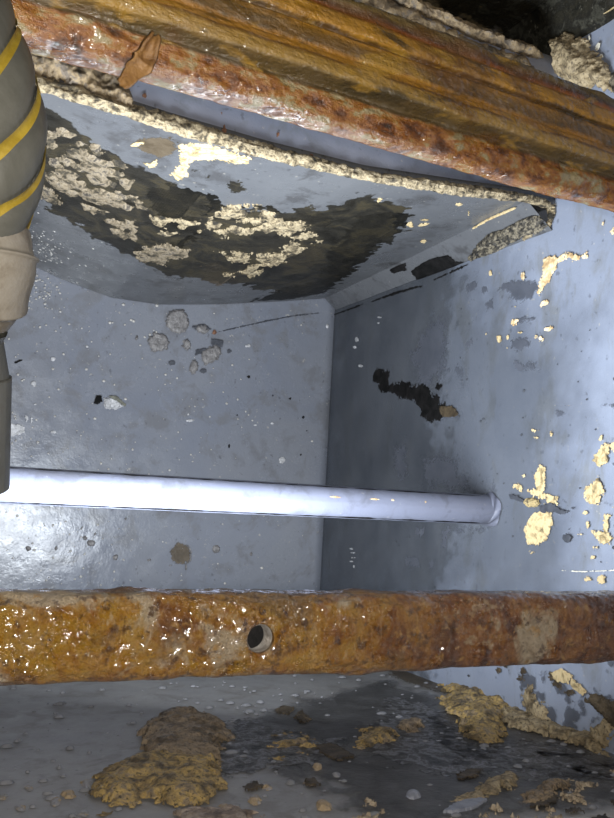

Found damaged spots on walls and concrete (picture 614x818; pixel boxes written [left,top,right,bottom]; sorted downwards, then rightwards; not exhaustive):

rust [118,31,161,89]
rust [137,137,180,158]
leakage [31,108,415,302]
rust [390,216,547,280]
leakage [28,275,71,332]
peeling [537,251,588,307]
peeling [592,435,614,467]
peeling [513,464,558,554]
peeling [577,478,613,559]
rust [548,672,575,696]
leakage [220,668,614,818]
spalling [242,780,264,791]